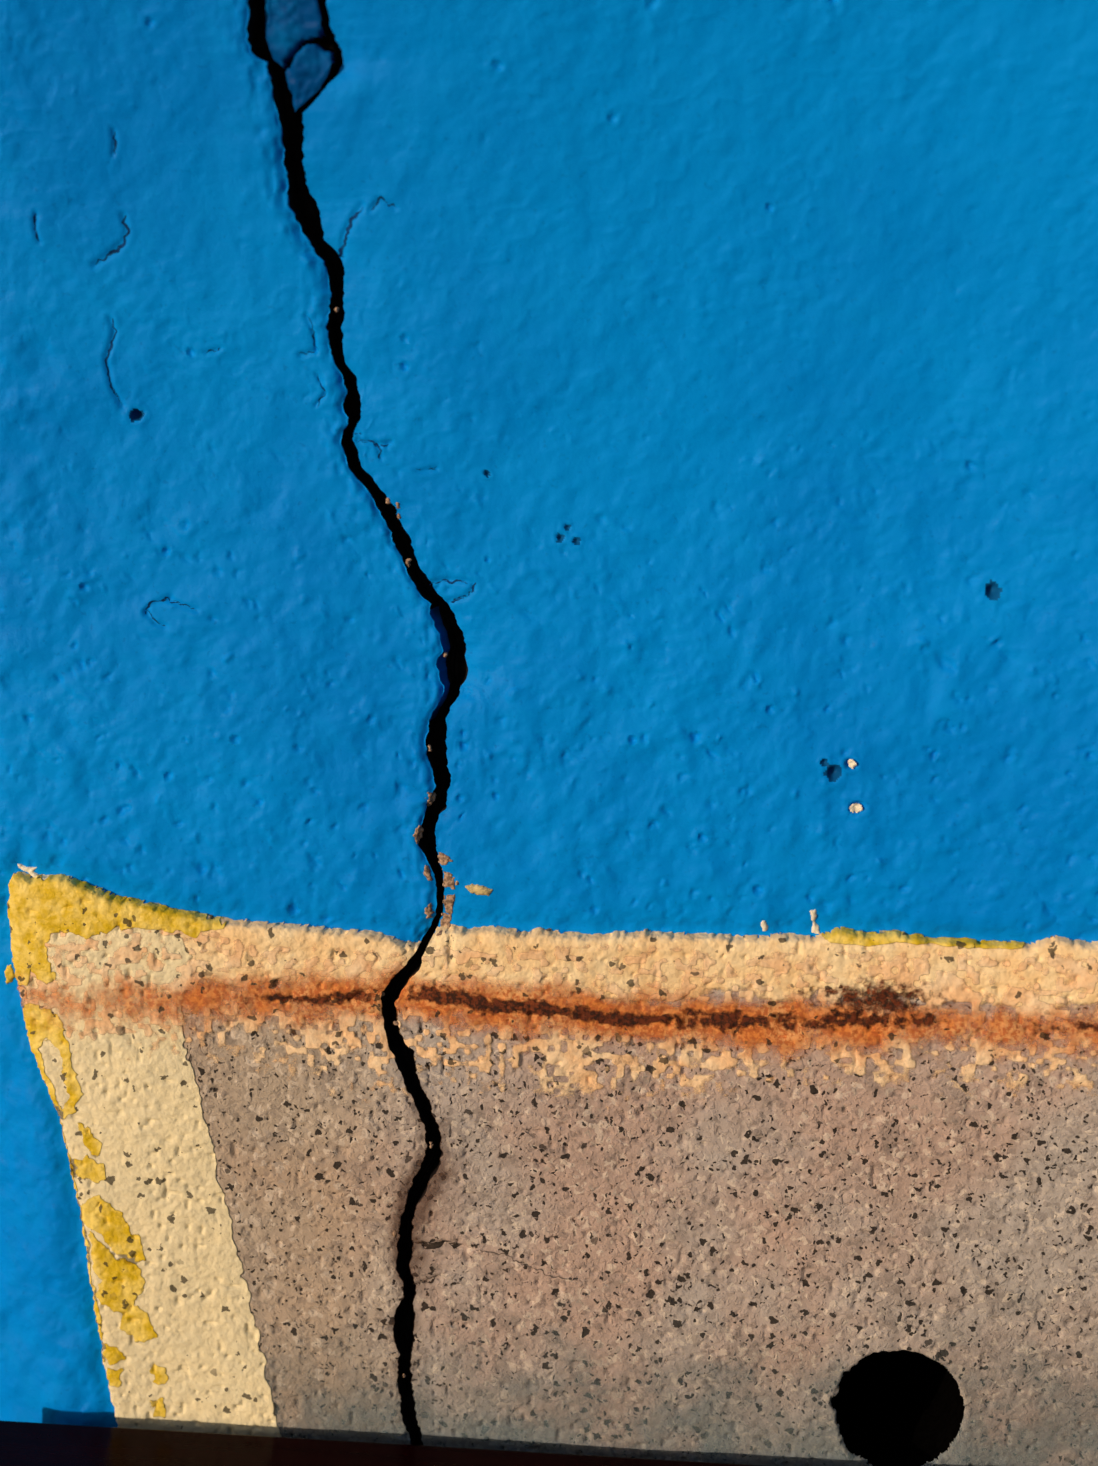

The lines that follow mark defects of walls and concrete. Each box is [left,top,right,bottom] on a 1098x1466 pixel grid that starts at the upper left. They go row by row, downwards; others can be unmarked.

crack [246,0,582,1445]
peeling [4,864,1098,1437]
corrosion [29,972,1098,1056]